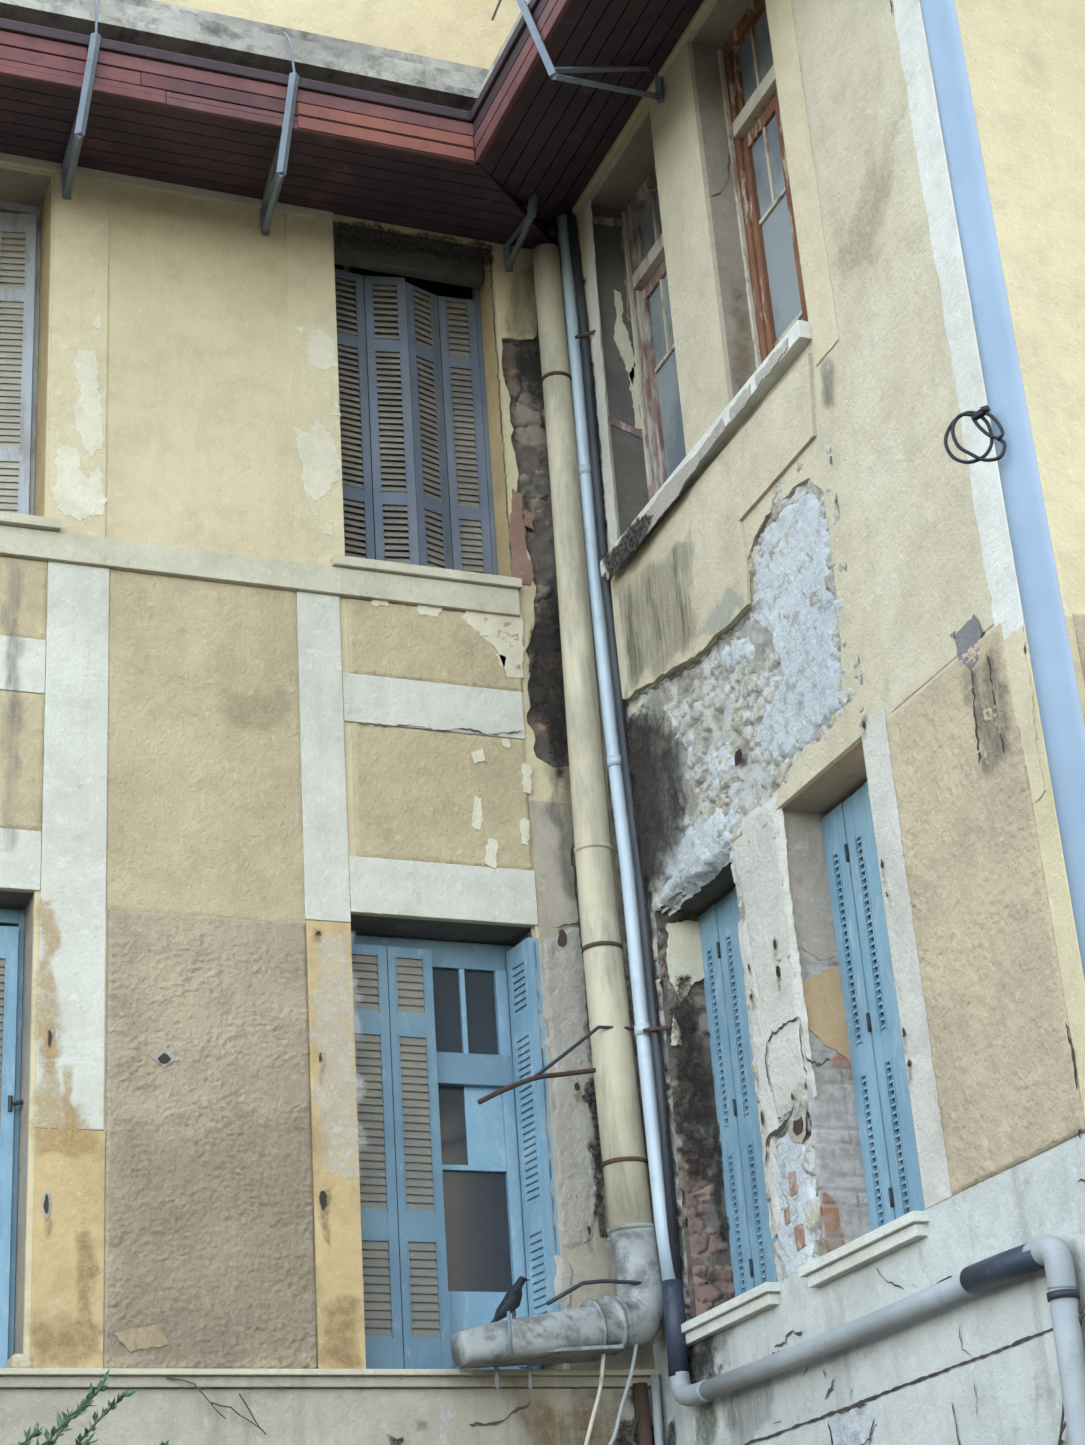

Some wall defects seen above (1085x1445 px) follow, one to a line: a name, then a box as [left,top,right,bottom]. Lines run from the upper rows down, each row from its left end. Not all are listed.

peeling [295,326,337,370]
peeling [51,349,107,522]
peeling [294,400,341,537]
flaking render [462,250,569,795]
peeling [417,605,442,617]
peeling [471,796,499,869]
peeling [519,817,530,847]
flaking render [625,462,867,1322]
flaking render [610,797,648,1158]
crack [469,1401,531,1445]
crack [744,1325,1053,1445]